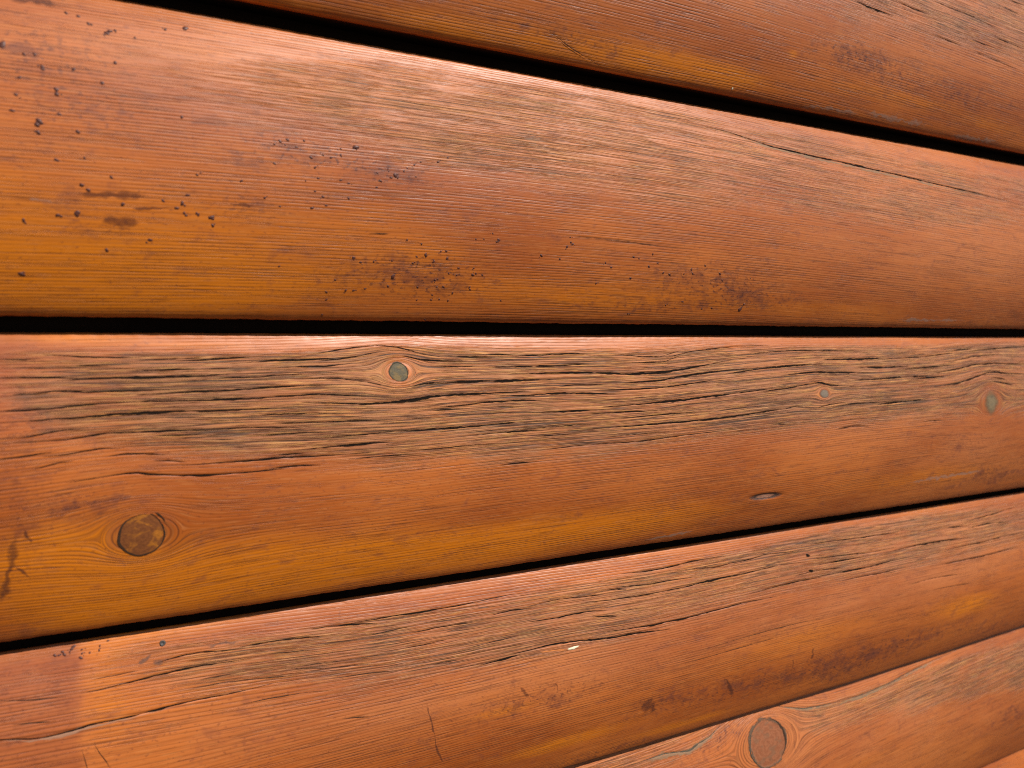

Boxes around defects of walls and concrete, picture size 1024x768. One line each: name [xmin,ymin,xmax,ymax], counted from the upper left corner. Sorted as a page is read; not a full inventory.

crack [687,122,1006,201]
crack [0,345,1024,482]
crack [0,507,1024,740]